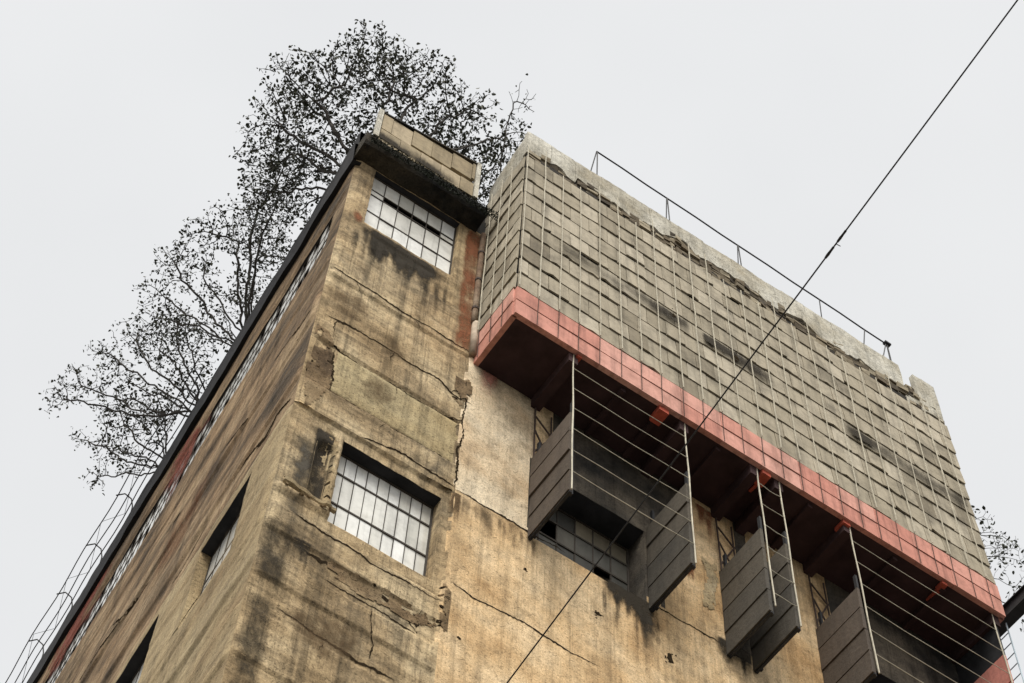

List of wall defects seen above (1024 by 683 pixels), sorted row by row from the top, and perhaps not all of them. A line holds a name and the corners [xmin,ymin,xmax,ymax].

water stain [354,228,446,300]
crack [335,267,469,352]
spalling [304,324,334,407]
crack [275,304,564,552]
spalling [283,427,339,514]
water stain [260,520,311,583]
water stain [241,599,268,677]
spalling [327,561,461,640]
crack [278,512,596,679]
water stain [603,580,659,643]